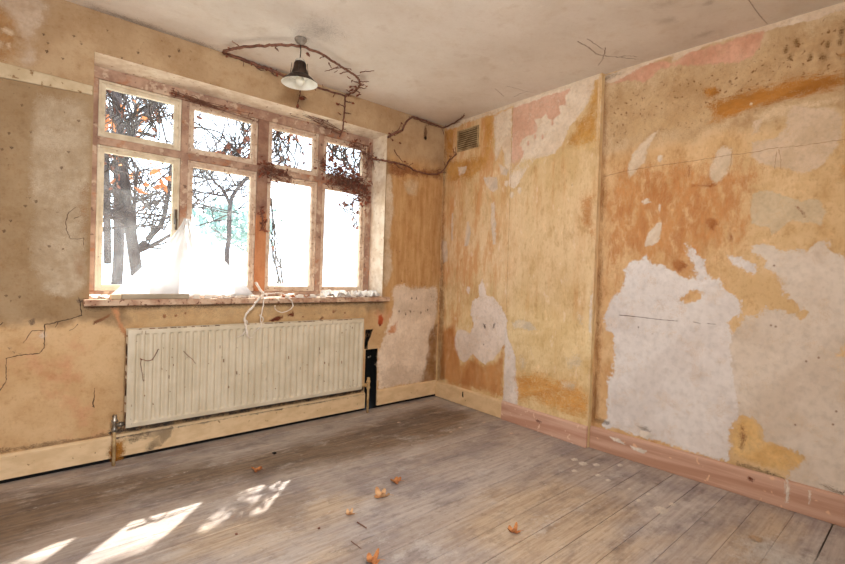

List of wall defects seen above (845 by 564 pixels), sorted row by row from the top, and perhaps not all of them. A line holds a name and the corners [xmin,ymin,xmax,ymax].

crack [577,39,635,63]
flaking render [493,76,596,198]
peeling [627,130,658,178]
peeling [709,146,733,184]
flaking render [364,173,438,389]
flaking render [727,255,758,276]
crack [0,297,86,390]
flaking render [455,278,536,405]
flaking render [602,198,743,462]